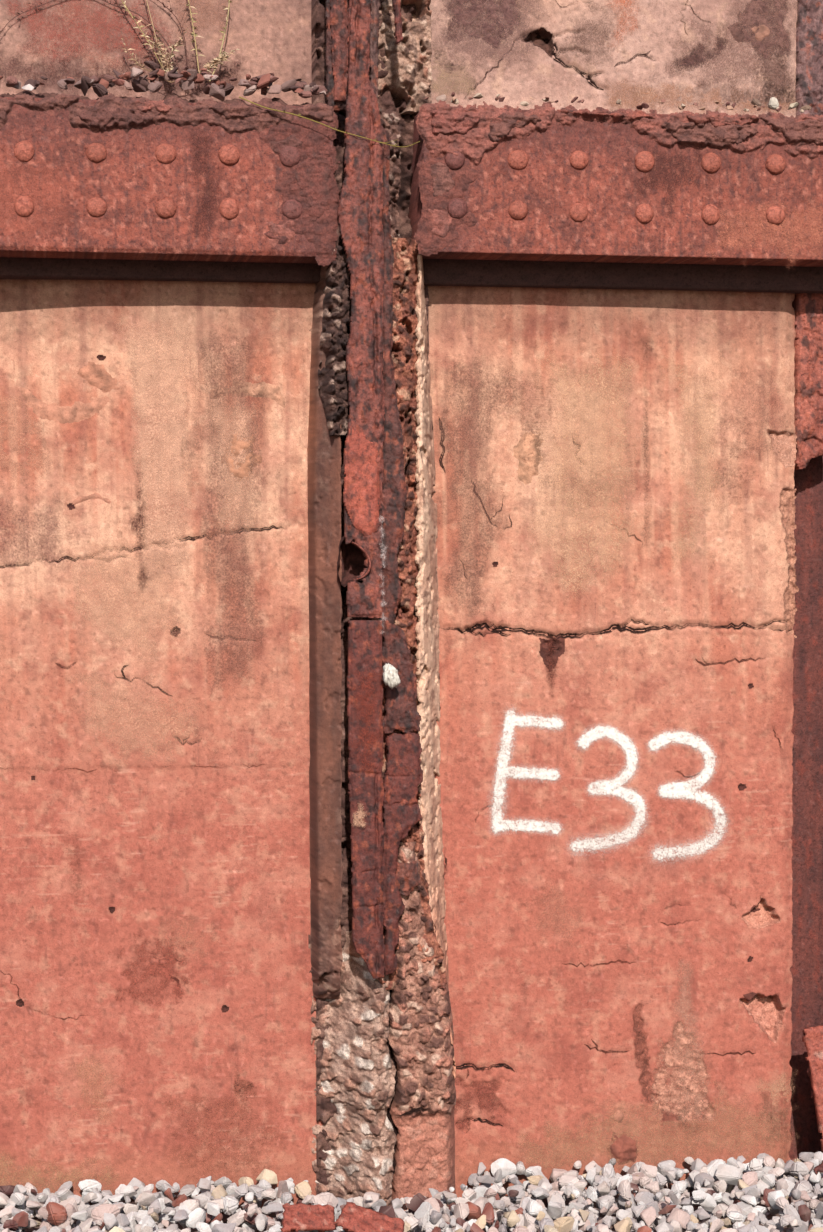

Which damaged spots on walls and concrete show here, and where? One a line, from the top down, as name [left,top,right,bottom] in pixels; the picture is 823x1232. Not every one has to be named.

damp [431,0,535,94]
peeling [448,0,554,57]
crack [467,3,651,95]
corrosion [0,93,340,266]
corrosion [414,100,823,261]
spalling [318,246,380,538]
spalling [369,0,432,705]
crack [0,525,282,568]
spalling [539,636,565,672]
crack [443,619,790,666]
spalling [310,784,506,1211]
spalling [740,992,786,1043]